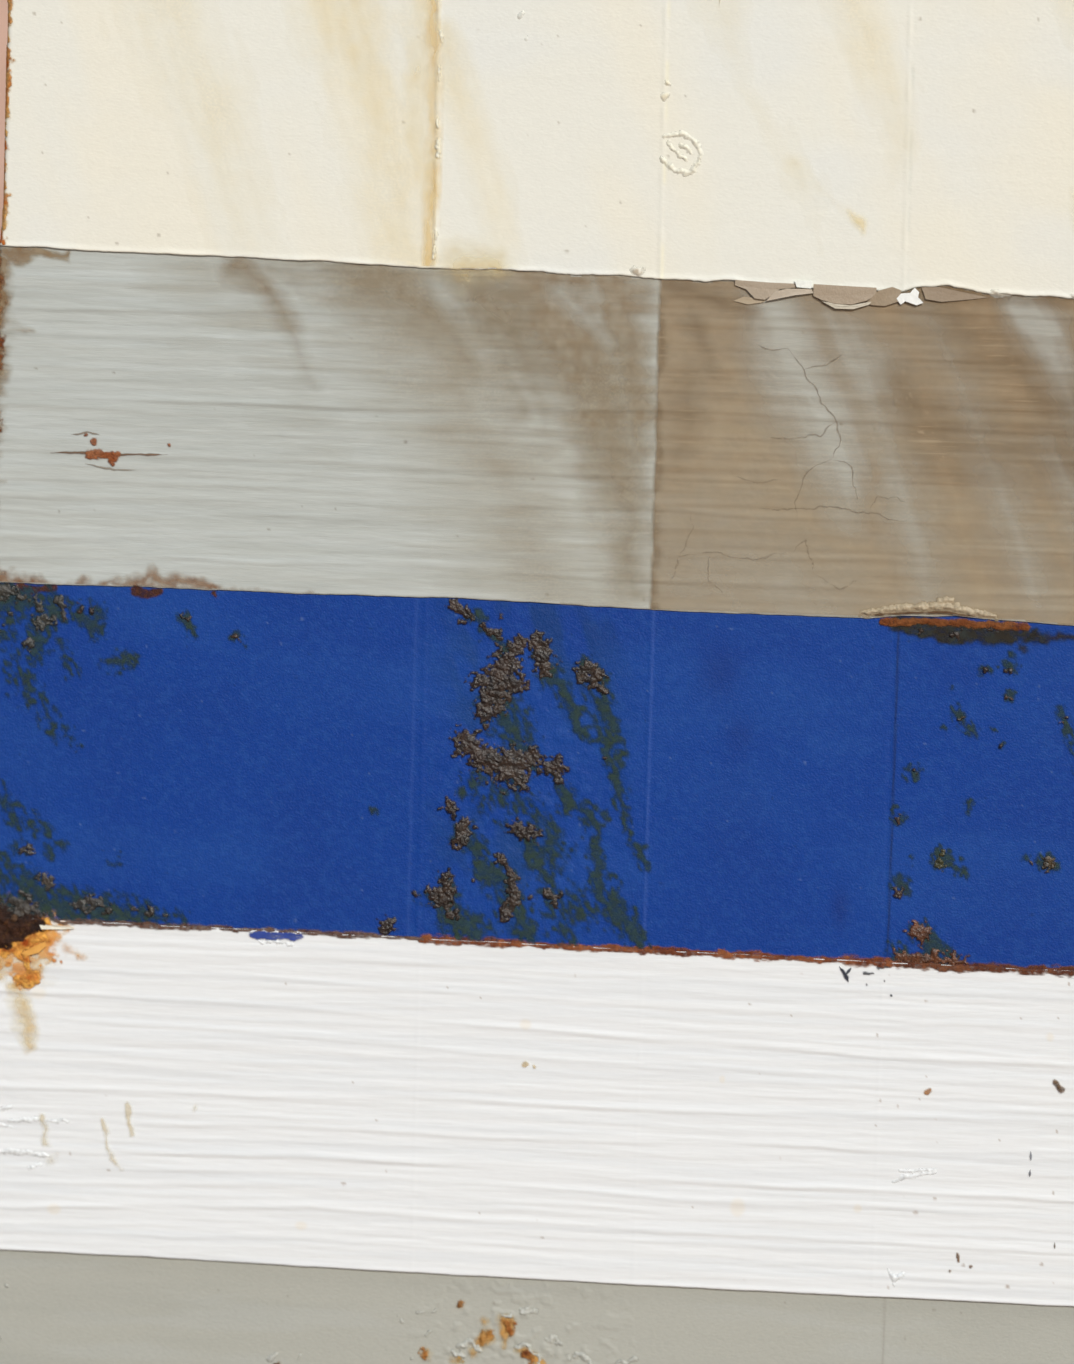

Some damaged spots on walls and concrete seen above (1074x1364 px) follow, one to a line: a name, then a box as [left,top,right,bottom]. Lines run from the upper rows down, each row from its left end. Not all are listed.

corrosion [0,0,69,382]
leakage [344,265,443,322]
peeling [734,280,1012,309]
corrosion [55,431,170,471]
leakage [457,271,1074,625]
corrosion [0,571,106,748]
corrosion [123,571,218,598]
corrosion [0,598,1074,977]